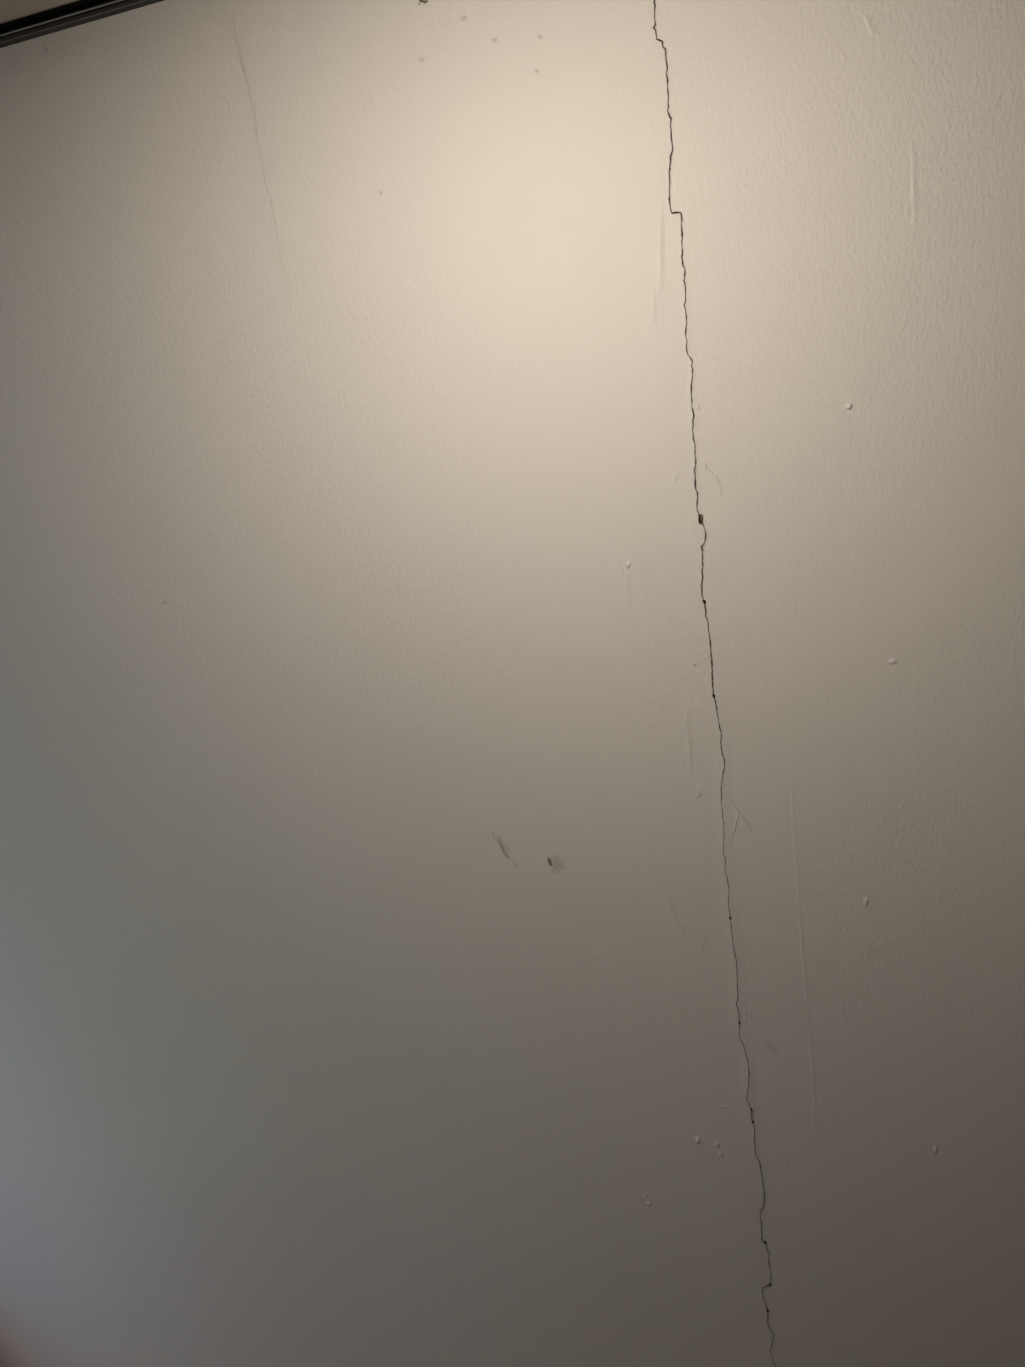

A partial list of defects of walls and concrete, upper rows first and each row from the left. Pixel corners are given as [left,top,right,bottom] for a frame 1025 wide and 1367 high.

crack [653,0,775,1365]